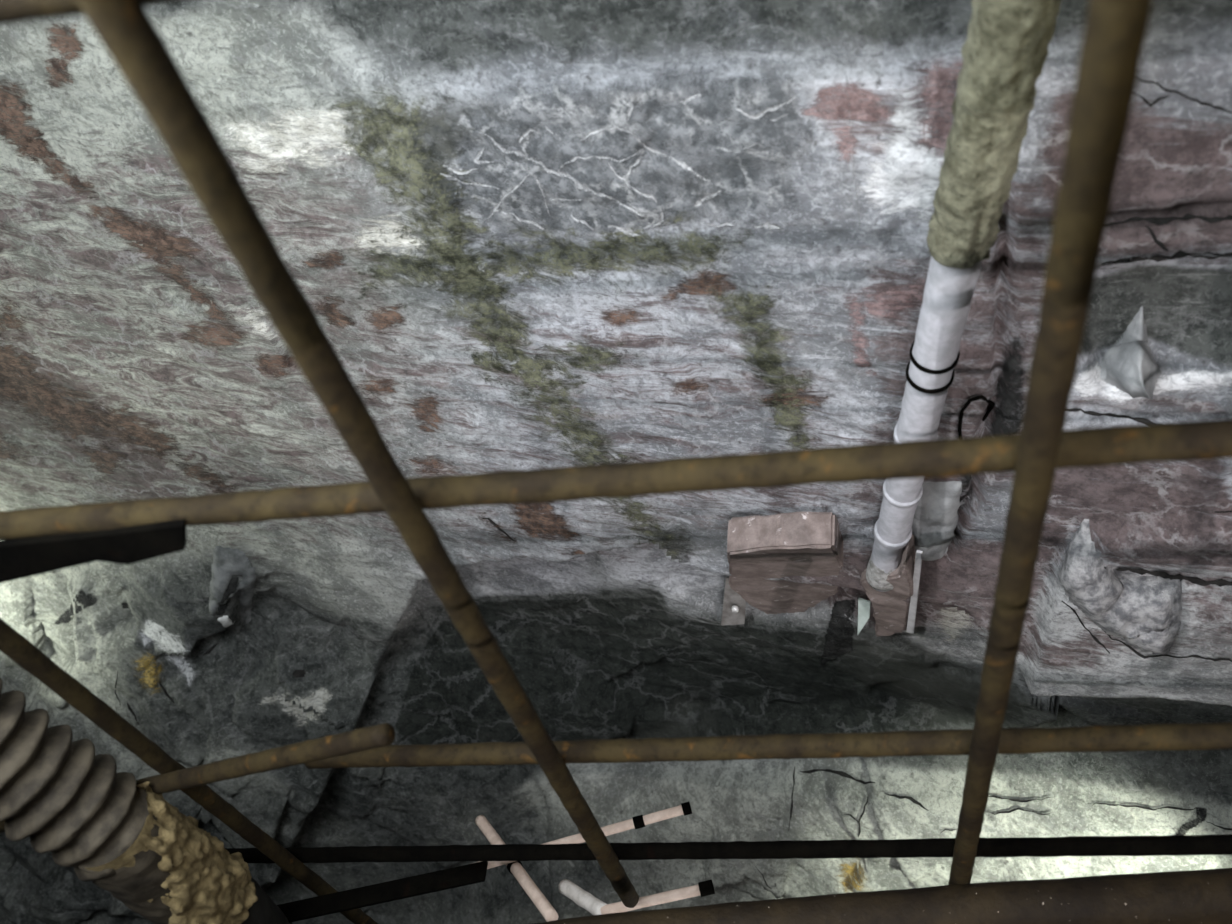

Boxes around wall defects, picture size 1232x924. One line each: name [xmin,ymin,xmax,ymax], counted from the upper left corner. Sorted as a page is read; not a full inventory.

rust [802,83,895,161]
crack [1135,79,1232,113]
water stain [212,88,746,465]
water stain [708,285,812,449]
water stain [596,497,692,563]
crack [1104,567,1232,587]
crack [1062,594,1232,662]
crack [788,768,957,837]
crack [989,795,1051,815]
crack [1093,803,1232,830]